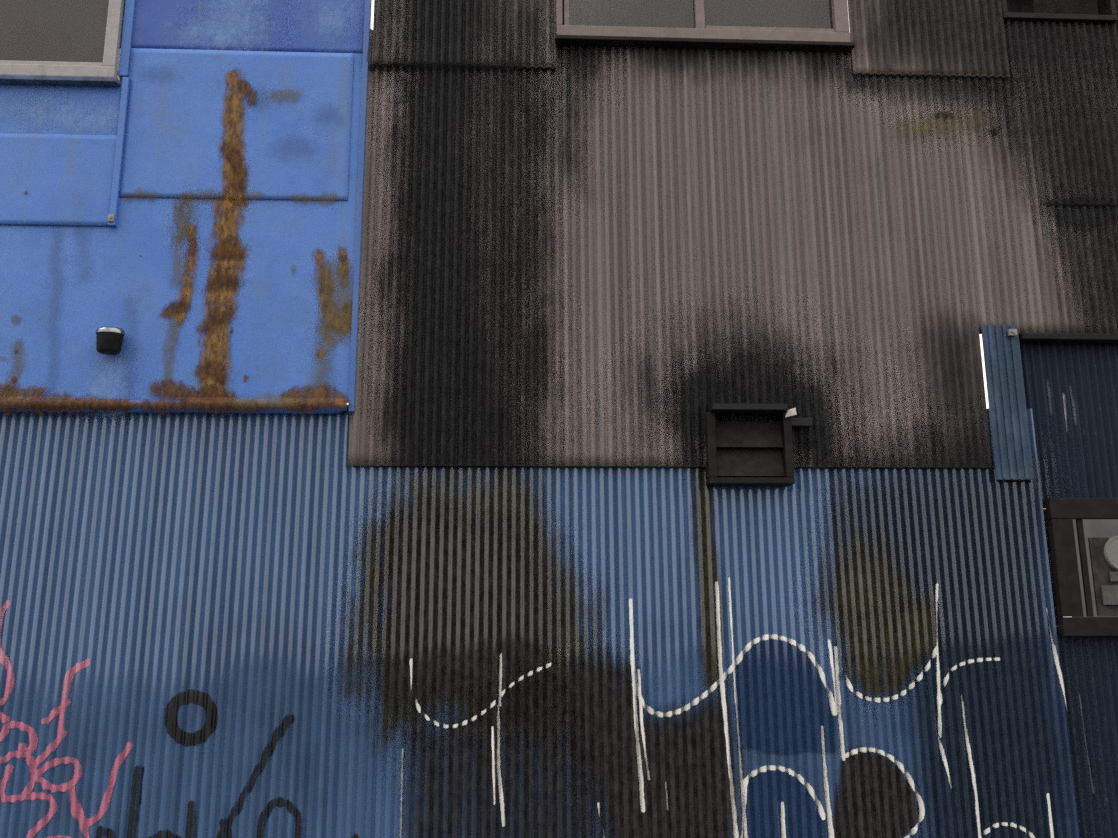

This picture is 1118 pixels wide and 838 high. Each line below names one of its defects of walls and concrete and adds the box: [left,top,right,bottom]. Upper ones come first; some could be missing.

corrosion [0,70,353,415]